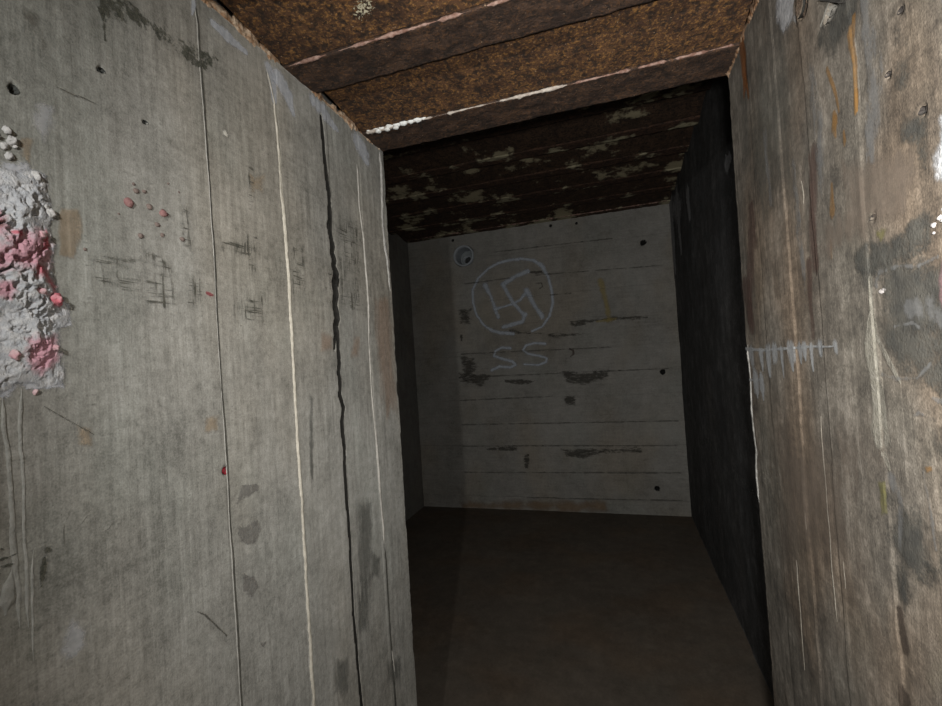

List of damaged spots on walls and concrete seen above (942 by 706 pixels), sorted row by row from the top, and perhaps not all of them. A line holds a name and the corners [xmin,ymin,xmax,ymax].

damp [210,19,248,55]
damp [266,62,295,116]
efflorescence [290,54,326,66]
damp [310,95,339,132]
efflorescence [339,12,465,51]
damp [901,116,942,179]
damp [855,208,942,396]
crack [320,114,363,706]
damp [893,512,942,654]
crack [385,551,397,706]